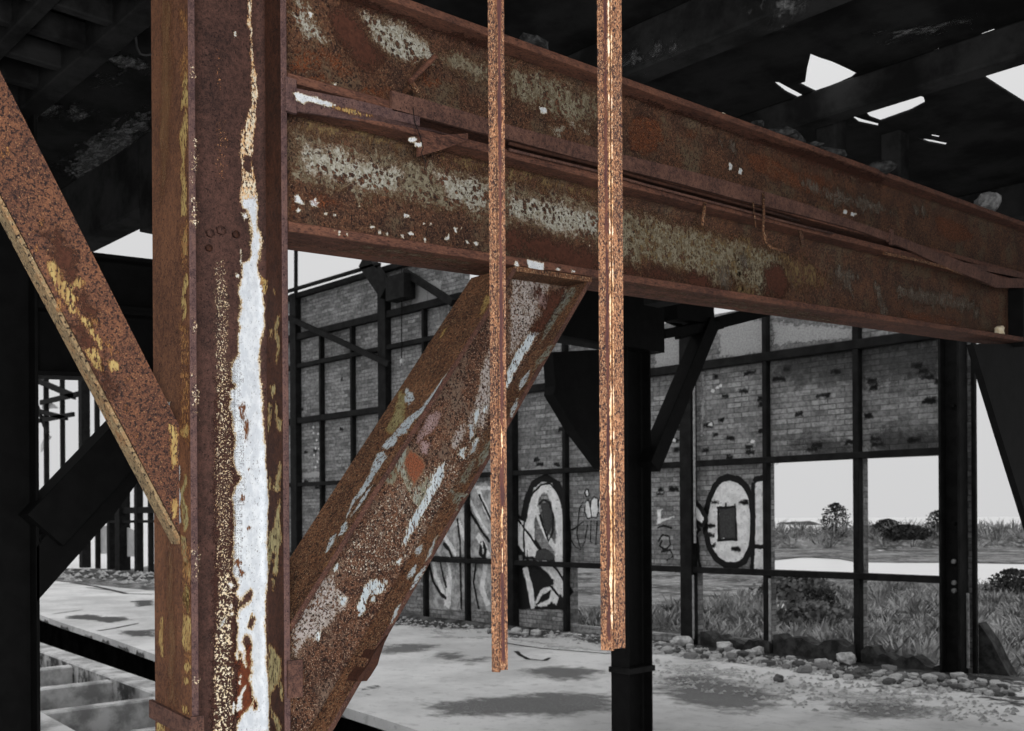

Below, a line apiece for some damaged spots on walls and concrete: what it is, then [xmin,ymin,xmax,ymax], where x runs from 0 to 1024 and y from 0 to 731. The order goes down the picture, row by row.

rust [625,96,885,190]
rust [39,225,119,402]
peeling [46,259,130,387]
peeling [211,0,503,731]
rust [327,0,611,662]
peeling [506,259,577,418]
rust [623,263,720,289]
rust [208,374,258,731]